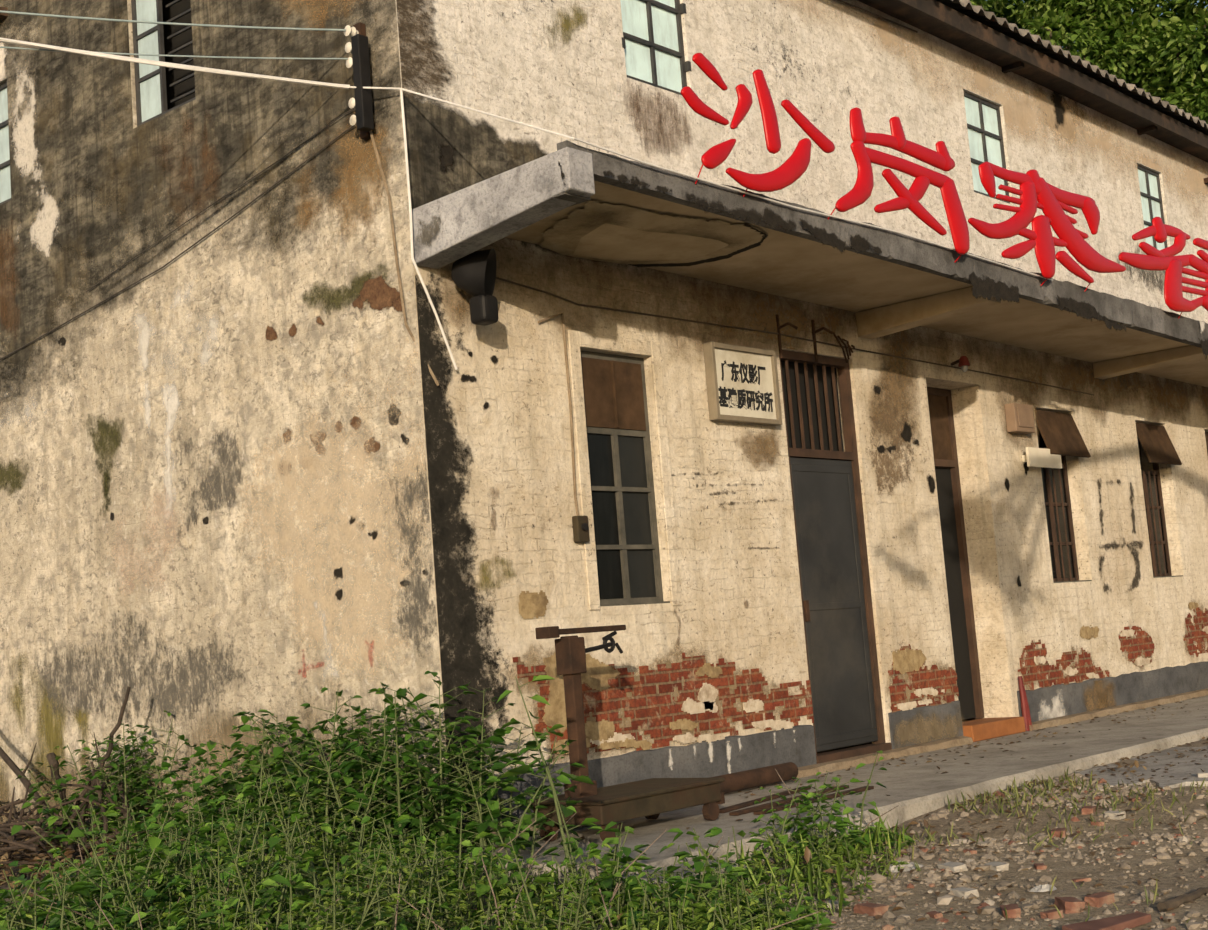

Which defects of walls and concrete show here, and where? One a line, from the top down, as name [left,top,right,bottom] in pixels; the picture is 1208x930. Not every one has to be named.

damp [0,0,548,416]
spalling [352,276,403,312]
damp [477,241,856,350]
damp [965,340,1208,443]
damp [144,384,243,535]
damp [390,273,508,782]
damp [0,614,417,851]
spalling [510,649,569,762]
spalling [581,641,814,755]
spalling [888,644,959,713]
spalling [1018,625,1110,690]
spalling [1183,602,1208,657]